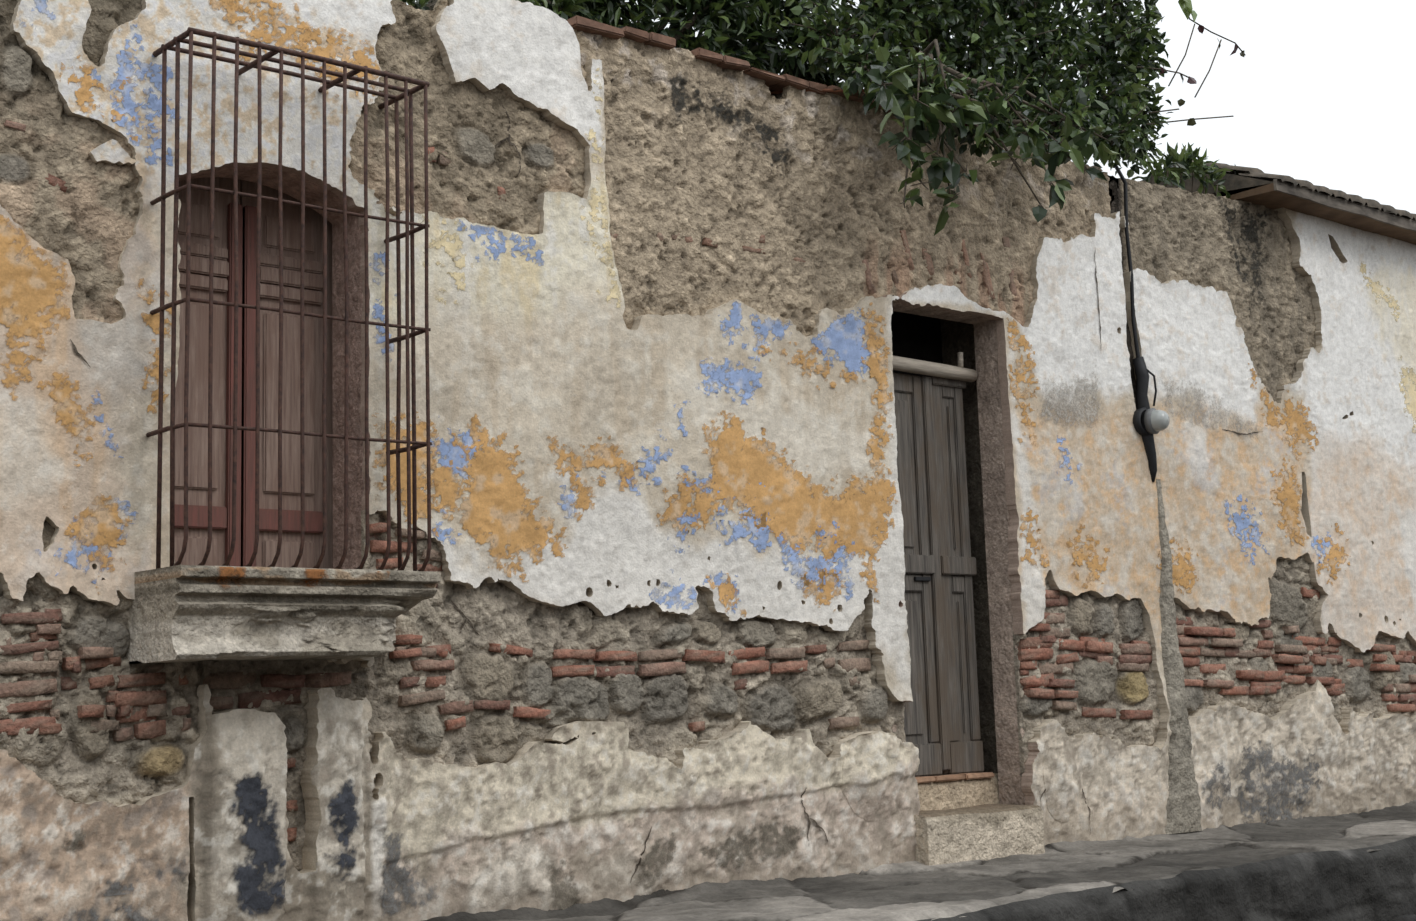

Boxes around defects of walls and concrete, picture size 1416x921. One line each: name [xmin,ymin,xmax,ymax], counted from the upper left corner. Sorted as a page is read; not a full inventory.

flaking render [0,0,181,467]
flaking render [210,0,1416,723]
water stain [232,772,286,915]
water stain [326,779,360,880]
flaking render [0,411,906,871]
flaking render [1012,507,1160,777]